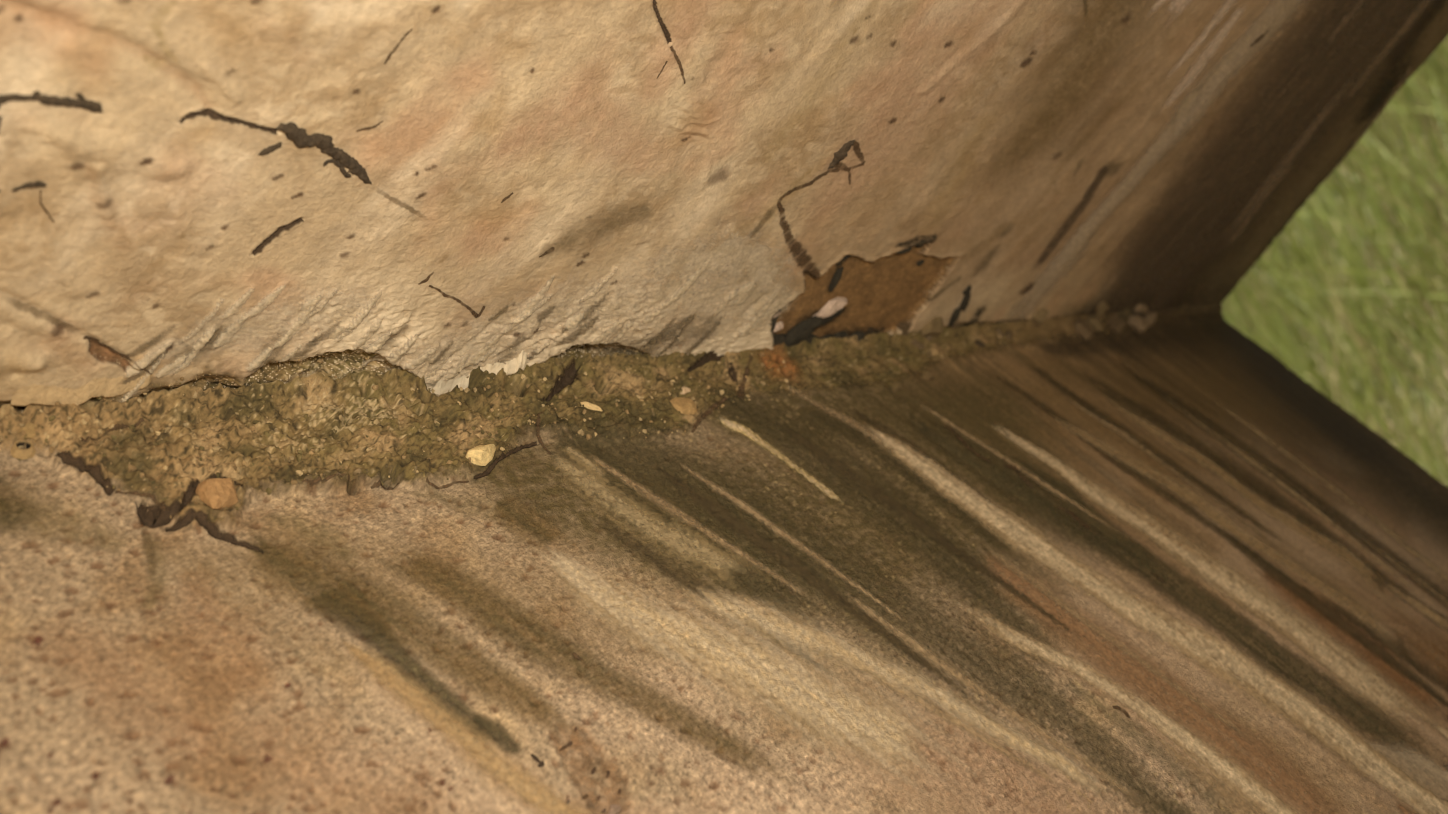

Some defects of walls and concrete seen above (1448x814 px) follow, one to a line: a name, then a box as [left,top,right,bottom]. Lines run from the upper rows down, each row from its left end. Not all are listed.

crack [0,91,104,125]
crack [179,109,372,184]
crack [653,0,685,84]
crack [777,139,866,279]
crack [54,319,151,374]
spalling [0,243,1200,524]
crack [56,418,263,553]
water stain [256,540,583,814]
water stain [414,561,752,759]
water stain [498,407,1185,814]
water stain [720,364,1448,814]